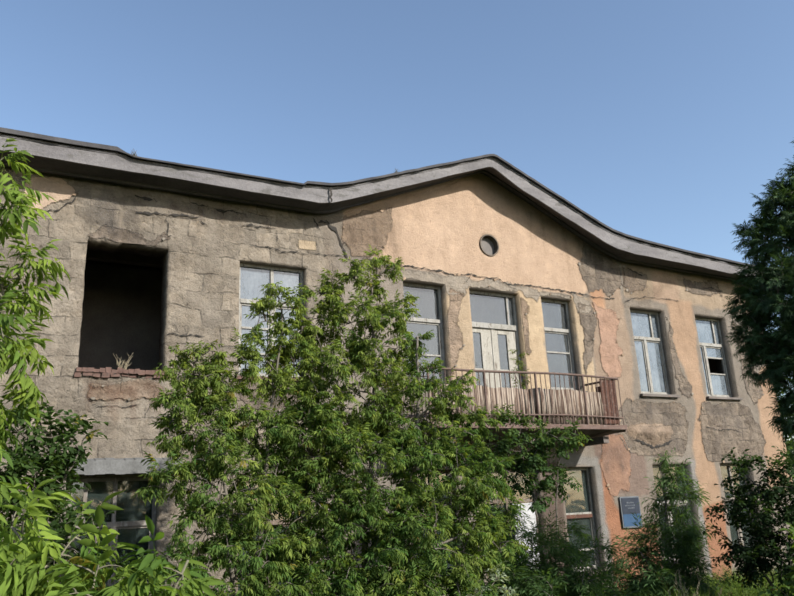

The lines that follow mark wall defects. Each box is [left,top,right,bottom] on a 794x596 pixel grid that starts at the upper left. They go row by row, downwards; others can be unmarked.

flaking render [24,176,76,209]
spalling [88,224,171,246]
crack [135,187,348,258]
spalling [298,240,316,250]
flaking render [341,207,648,381]
spalling [683,279,722,296]
spalling [87,378,164,401]
spalling [240,380,304,412]
spalling [600,318,694,496]
spalling [699,323,766,463]